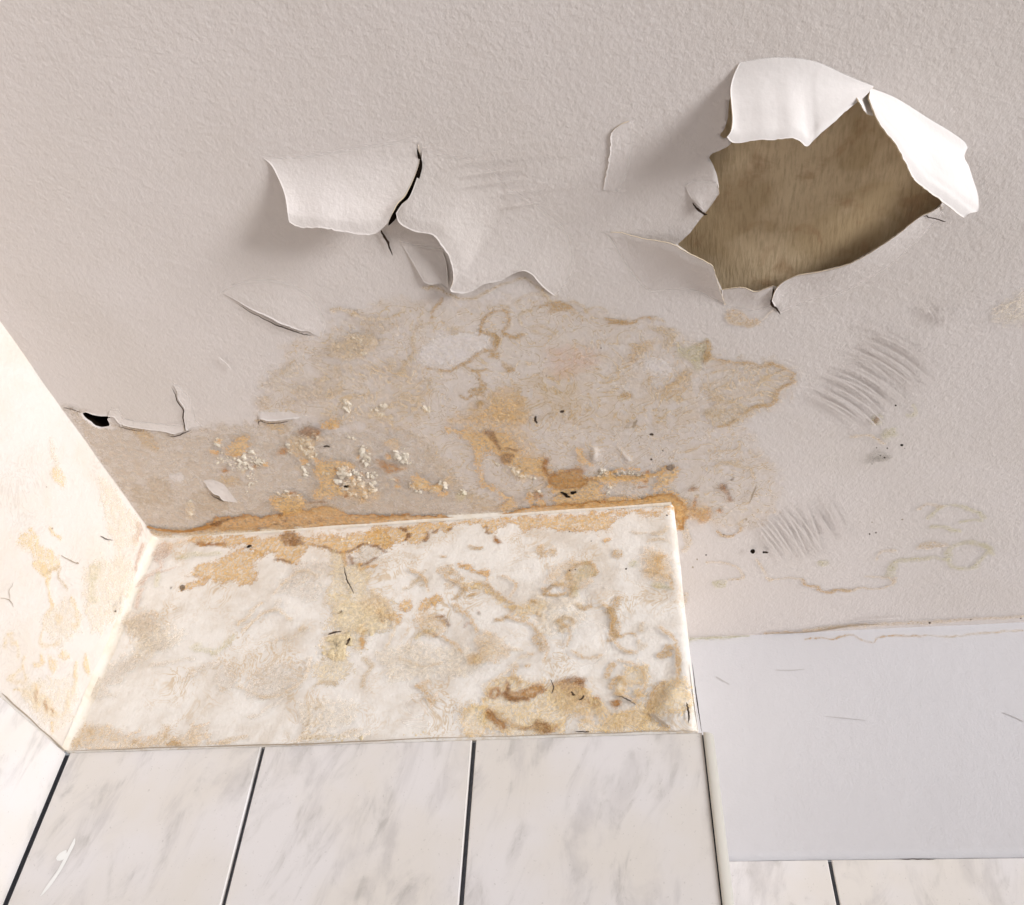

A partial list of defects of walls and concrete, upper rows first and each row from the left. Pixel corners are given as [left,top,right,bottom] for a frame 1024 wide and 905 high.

crack [381,149,422,256]
peeling [264,140,570,296]
peeling [223,282,324,337]
peeling [67,385,199,437]
peeling [258,410,304,425]
water stain [76,414,486,542]
water stain [321,592,388,662]
water stain [380,556,693,732]